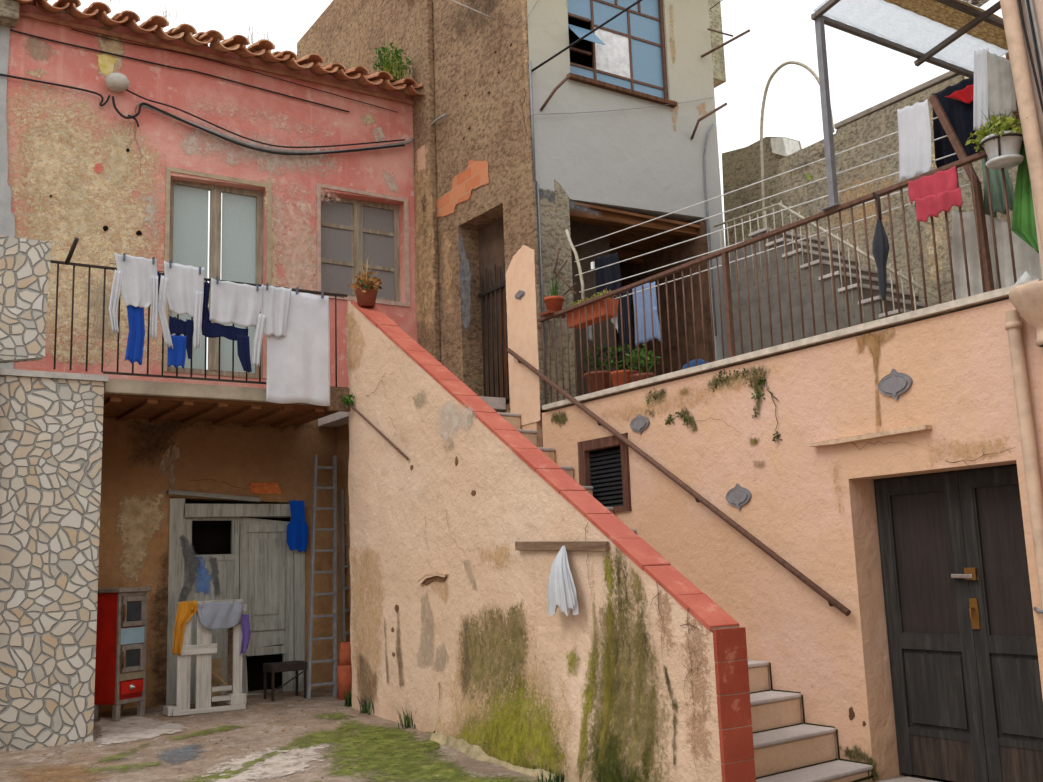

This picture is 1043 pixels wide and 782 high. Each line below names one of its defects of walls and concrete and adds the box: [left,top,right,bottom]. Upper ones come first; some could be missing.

flaking render [414,144,471,329]
corrosion [857,330,893,425]
crack [945,445,1016,467]
flaking render [116,445,180,583]
flaking render [417,572,448,671]
damp [664,667,678,765]